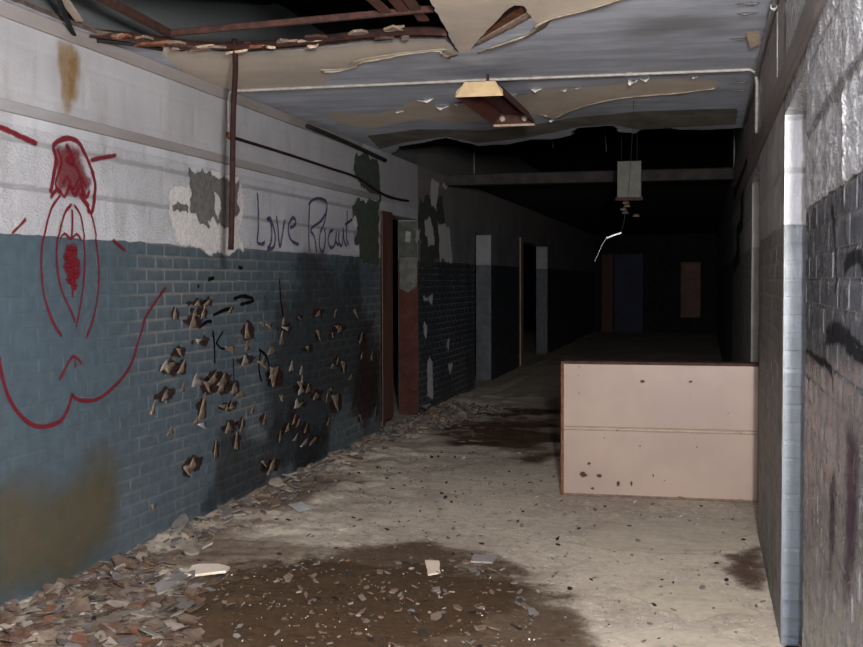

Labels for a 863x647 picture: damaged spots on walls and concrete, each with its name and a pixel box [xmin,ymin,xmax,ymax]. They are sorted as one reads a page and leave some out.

peeling [89,0,623,95]
spalling [169,167,244,256]
peeling [149,296,266,477]
peeling [224,309,346,447]
peeling [330,328,379,422]